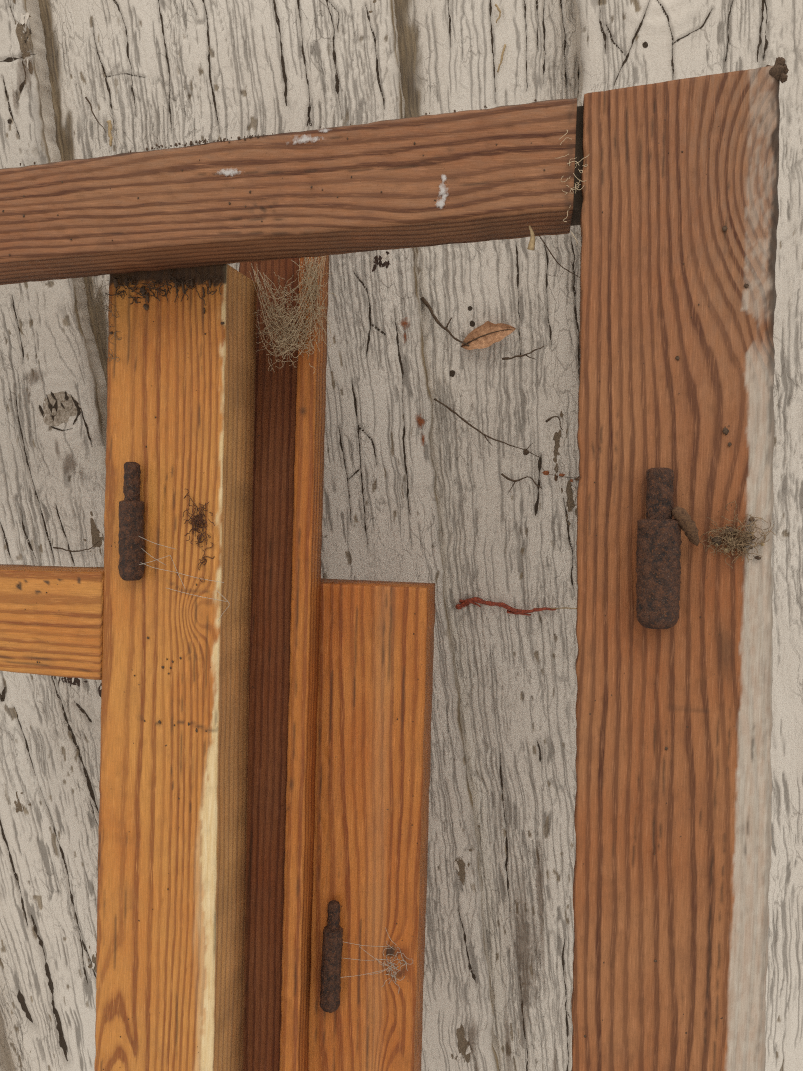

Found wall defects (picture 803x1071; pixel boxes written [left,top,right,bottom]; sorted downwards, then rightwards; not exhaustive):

crack [562,939,570,1071]